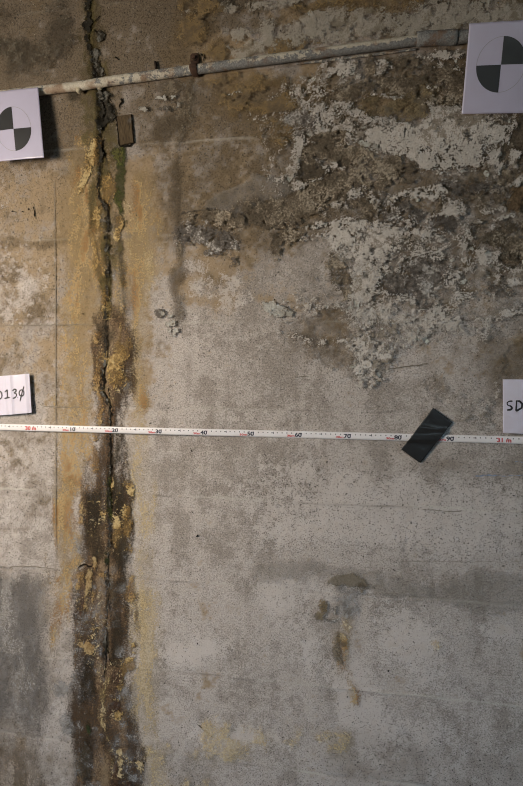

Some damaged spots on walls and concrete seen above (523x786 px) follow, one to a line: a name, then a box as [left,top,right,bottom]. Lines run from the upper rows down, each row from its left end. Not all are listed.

damp [0,131,170,786]
crack [78,0,135,678]
peeling [169,49,523,390]